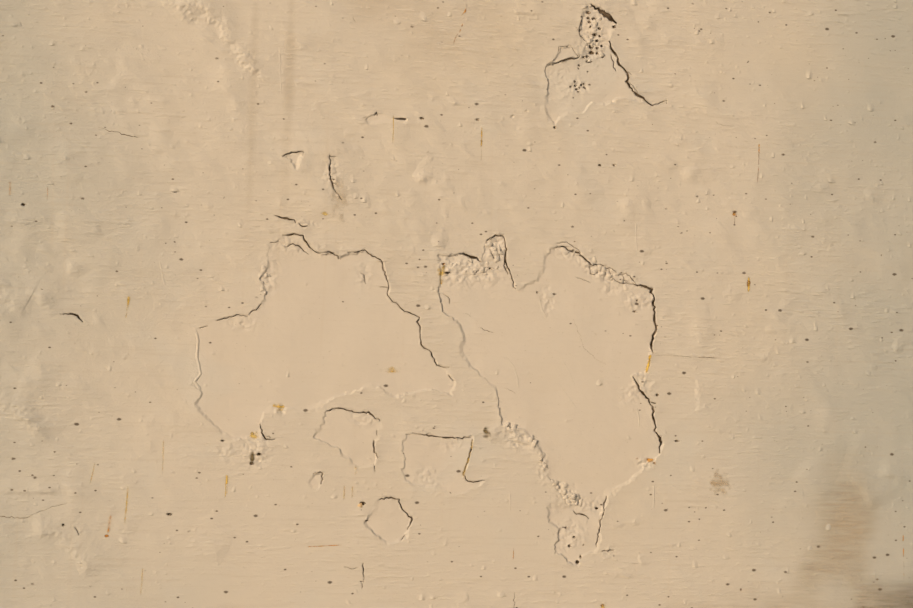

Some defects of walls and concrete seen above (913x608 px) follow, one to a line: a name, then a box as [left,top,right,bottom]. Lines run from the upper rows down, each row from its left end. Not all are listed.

crack [553,5,667,106]
crack [274,215,454,381]
crack [454,235,514,287]
crack [562,242,714,452]
crack [414,433,484,482]